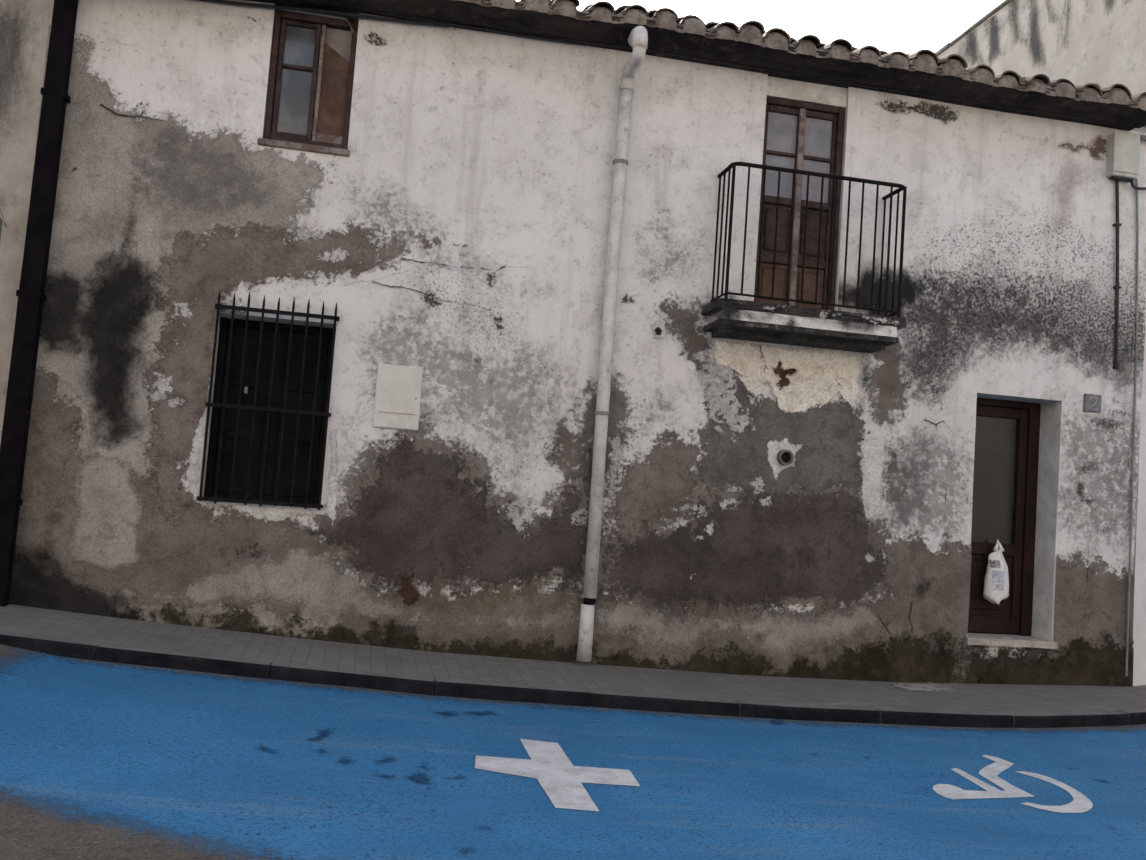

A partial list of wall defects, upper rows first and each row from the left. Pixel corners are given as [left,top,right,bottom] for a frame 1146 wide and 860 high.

water stain [966,16,999,64]
water stain [1009,0,1070,64]
water stain [39,237,155,447]
peeling [186,346,339,526]
water stain [9,373,893,657]
peeling [369,292,568,449]
peeling [704,338,861,448]
peeling [767,437,802,479]
rust [773,361,797,390]
peeling [859,434,971,532]
water stain [838,204,1146,415]
peeling [1058,411,1140,544]